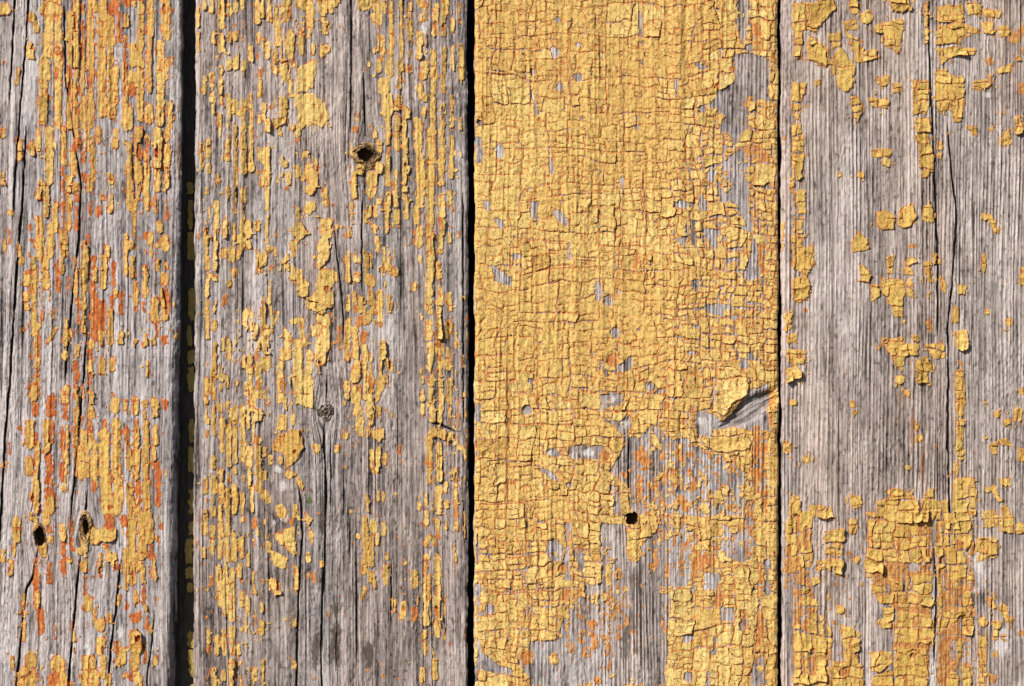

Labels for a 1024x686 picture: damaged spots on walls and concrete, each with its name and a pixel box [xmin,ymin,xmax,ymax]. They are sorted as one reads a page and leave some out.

peeling [0,0,179,686]
peeling [184,0,468,686]
peeling [467,0,1024,686]